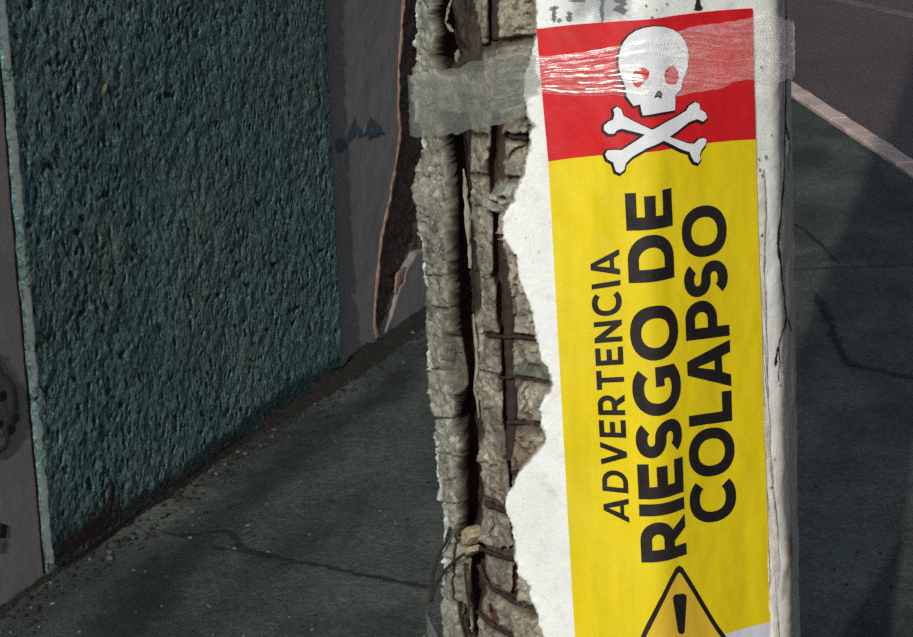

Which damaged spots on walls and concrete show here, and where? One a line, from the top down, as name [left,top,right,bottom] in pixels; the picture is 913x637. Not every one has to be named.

peeling [335,116,385,153]
spalling [373,0,551,637]
crack [774,5,792,381]